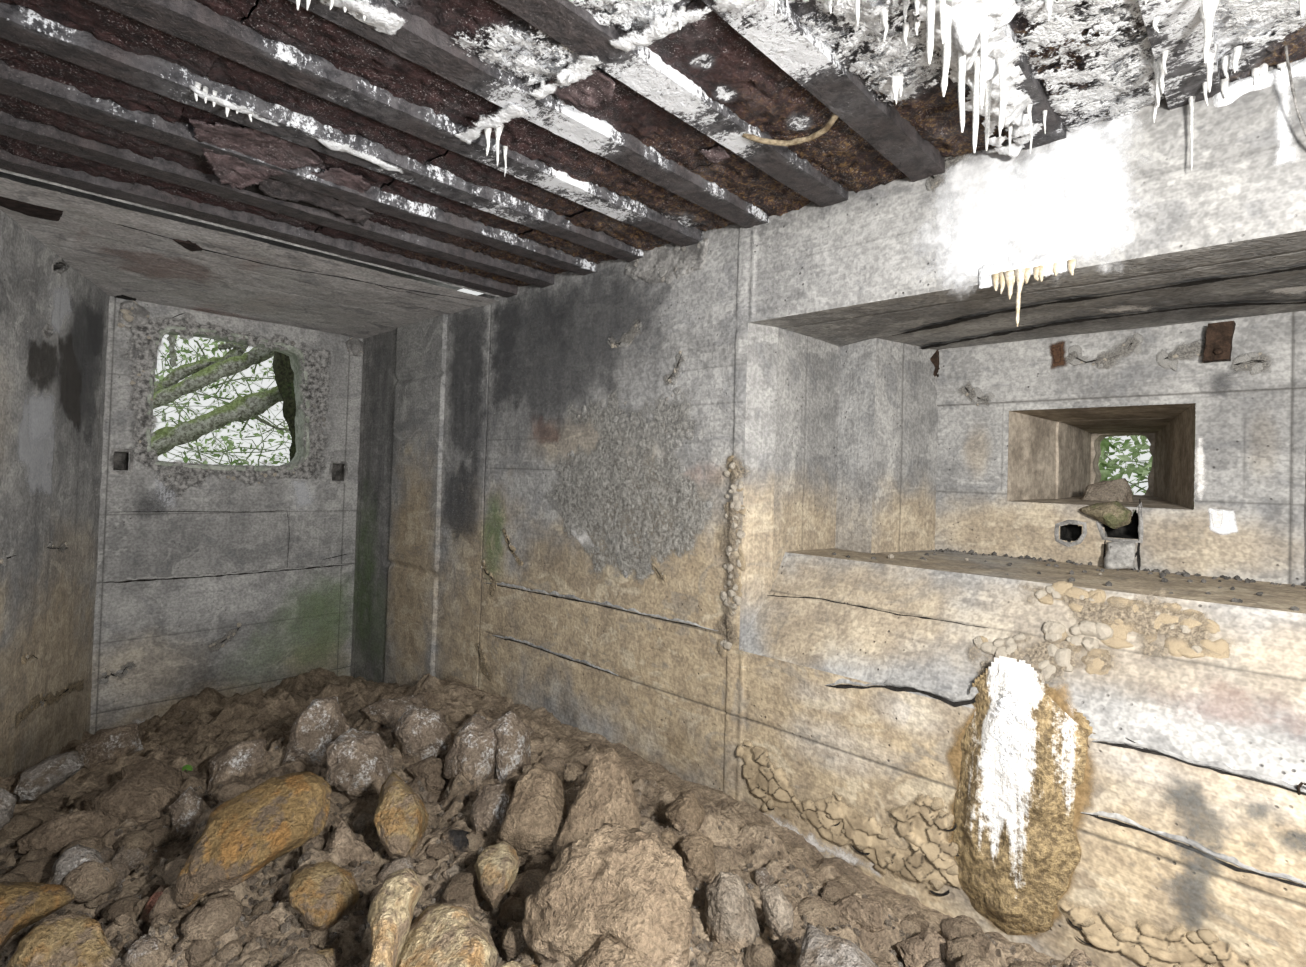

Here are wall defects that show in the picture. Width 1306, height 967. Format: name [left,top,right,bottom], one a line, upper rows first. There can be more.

leakage [452,21,601,177]
rust [540,63,615,109]
rust [699,145,730,164]
leakage [922,0,1169,285]
leakage [1188,0,1306,171]
leakage [19,288,82,493]
crack [825,677,979,707]
leakage [947,656,1096,936]
crack [1081,811,1306,888]